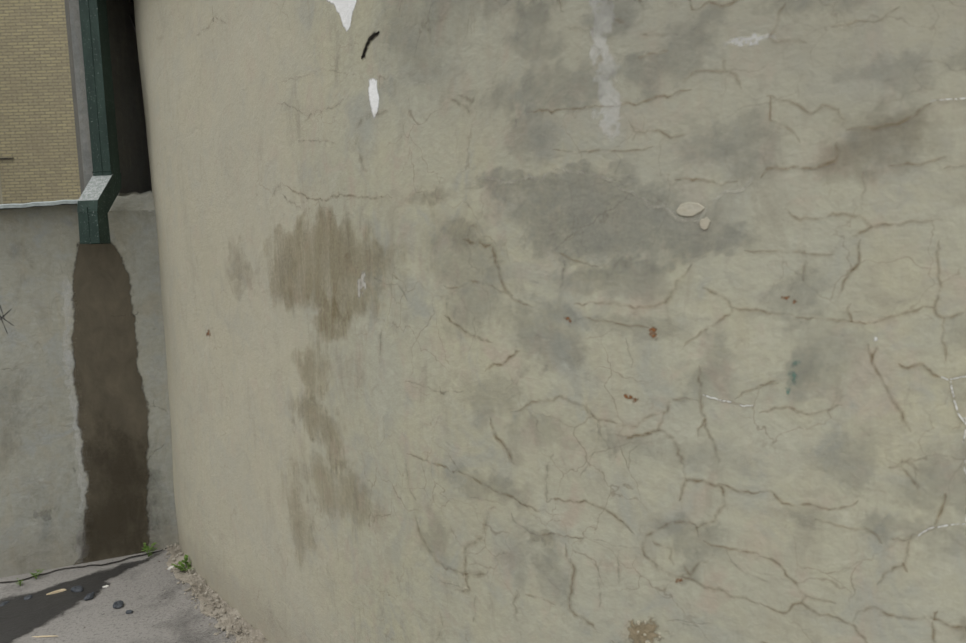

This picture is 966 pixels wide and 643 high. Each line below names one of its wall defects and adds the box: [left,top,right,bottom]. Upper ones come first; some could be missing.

crack [361,31,379,59]
crack [871,352,966,443]
leakage [0,242,150,643]
crack [918,493,966,536]
spalling [628,618,661,643]